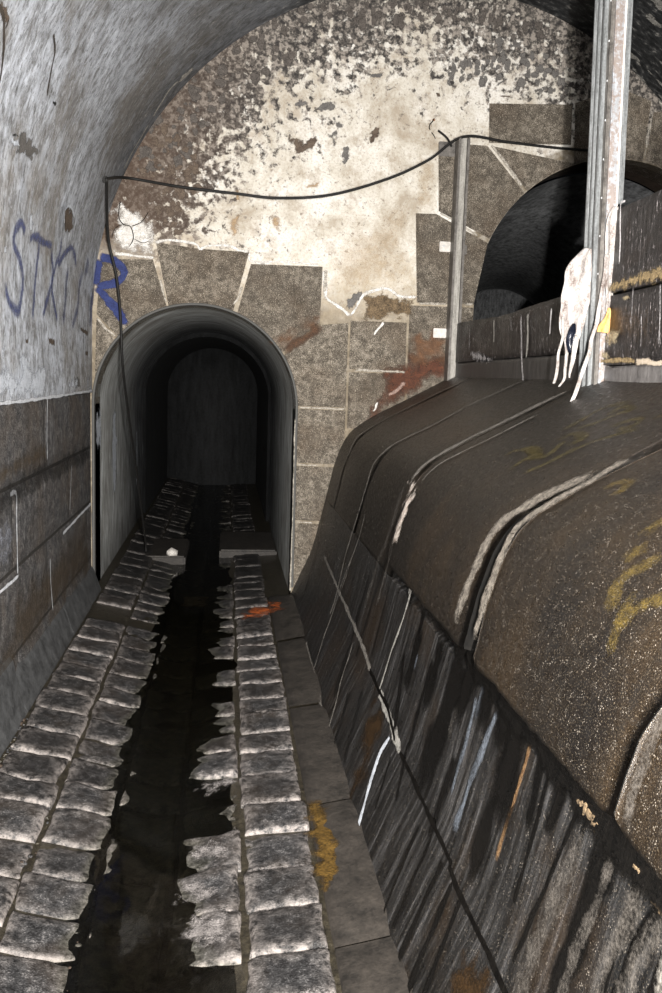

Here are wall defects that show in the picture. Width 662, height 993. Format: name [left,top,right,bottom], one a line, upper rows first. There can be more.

peeling [124,0,571,321]
rust [284,325,321,352]
rust [371,335,445,415]